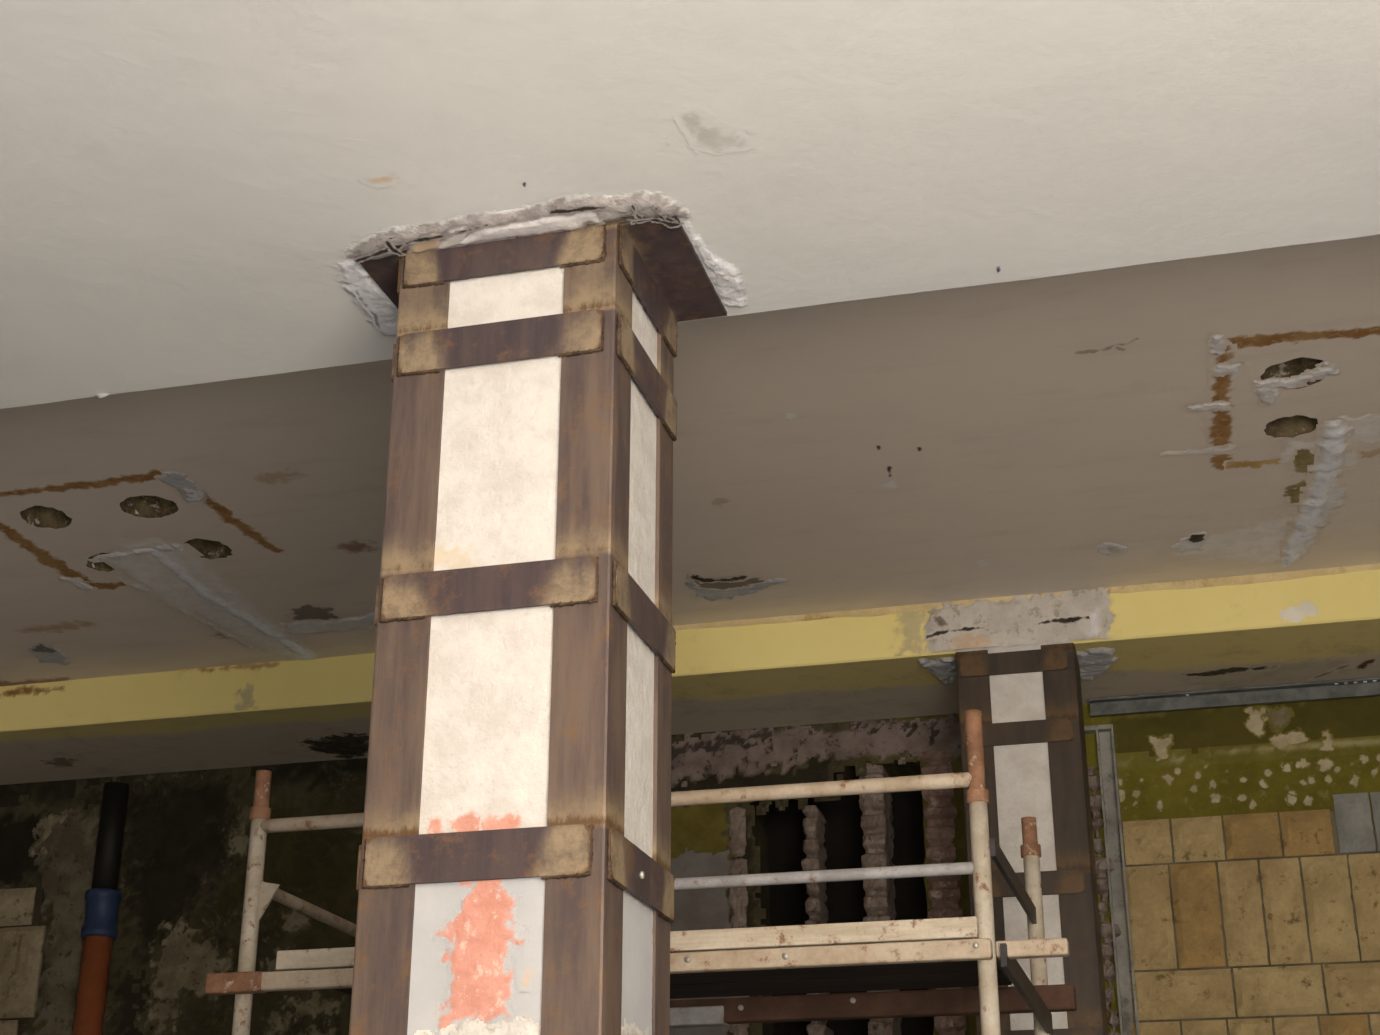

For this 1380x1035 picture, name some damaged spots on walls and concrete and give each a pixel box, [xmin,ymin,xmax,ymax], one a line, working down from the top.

spalling [342,189,694,263]
corrosion [1201,323,1380,473]
corrosion [0,467,164,500]
corrosion [0,519,134,594]
corrosion [198,492,289,557]
spalling [681,572,792,602]
peeling [1082,604,1107,639]
leakage [1106,696,1380,771]
flaking render [423,802,527,834]
leakage [0,755,368,993]
flaking render [414,879,530,1035]